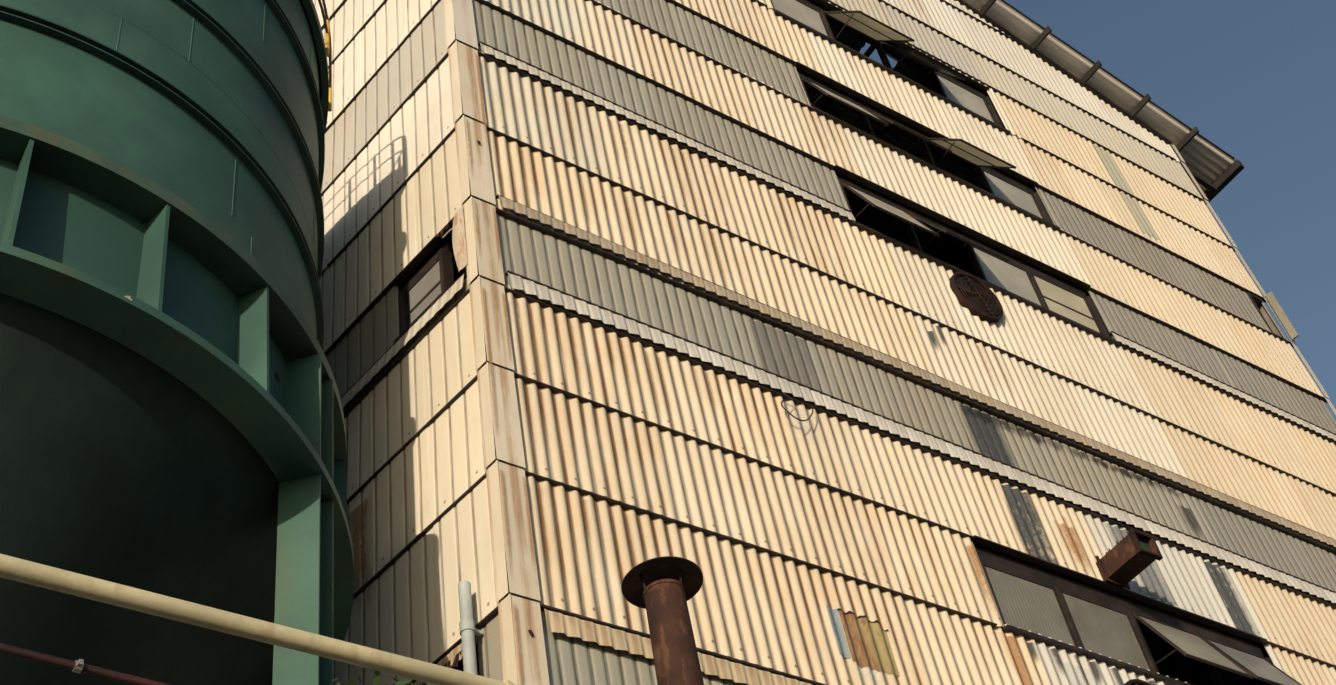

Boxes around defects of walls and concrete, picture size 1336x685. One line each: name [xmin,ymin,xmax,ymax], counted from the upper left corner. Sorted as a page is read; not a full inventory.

rust [483,288,494,391]
rust [502,293,538,373]
rust [500,470,510,544]
rust [524,478,546,553]
rust [967,546,990,590]
rust [514,606,534,685]
rust [1005,637,1031,685]